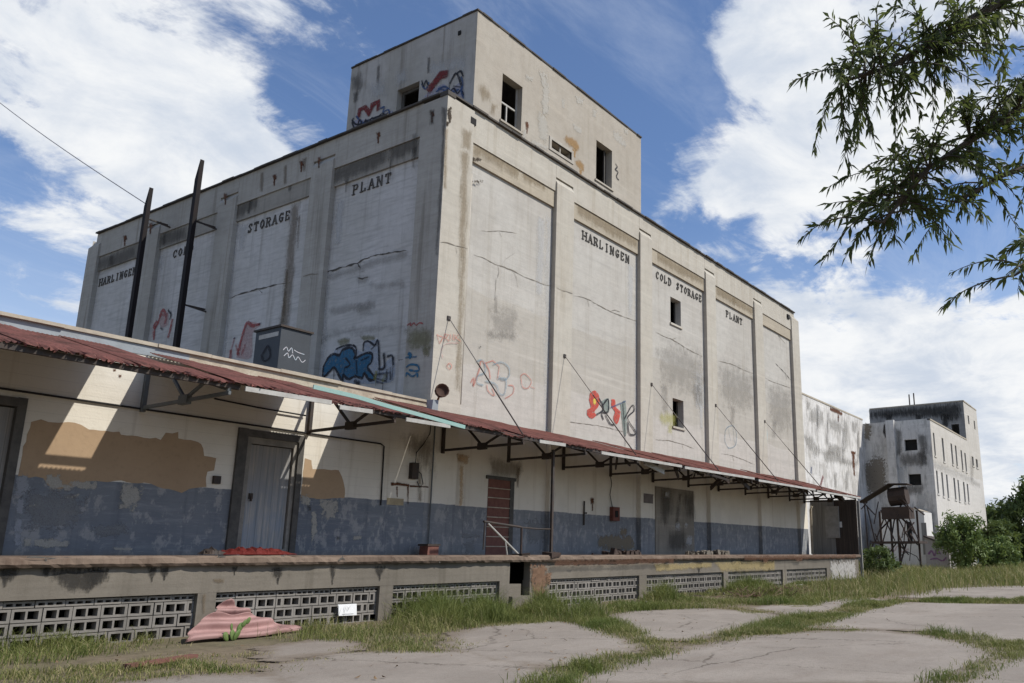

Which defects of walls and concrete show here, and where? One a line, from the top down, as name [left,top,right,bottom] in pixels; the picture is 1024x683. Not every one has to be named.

corrosion [565,137,584,174]
crack [229,250,406,299]
crack [444,231,636,321]